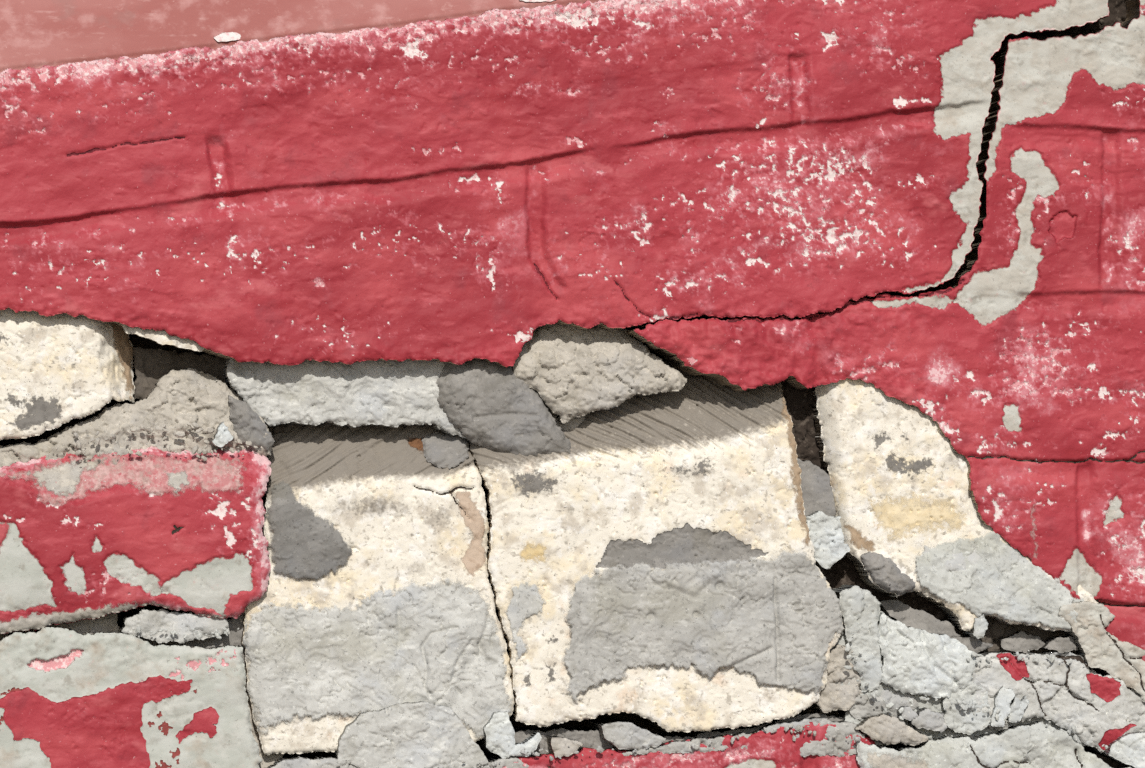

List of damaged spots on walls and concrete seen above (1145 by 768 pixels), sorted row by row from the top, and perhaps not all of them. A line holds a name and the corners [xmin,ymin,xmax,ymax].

crack [990,0,1127,60]
peeling [578,63,913,280]
crack [780,380,824,470]
peeling [953,312,1145,558]
peeling [0,453,259,634]
spalling [596,523,769,570]
crack [820,555,963,632]
peeling [0,649,238,768]
spalling [476,711,584,768]
crack [1011,655,1099,716]
crack [1074,748,1127,768]
crack [1096,600,1145,692]